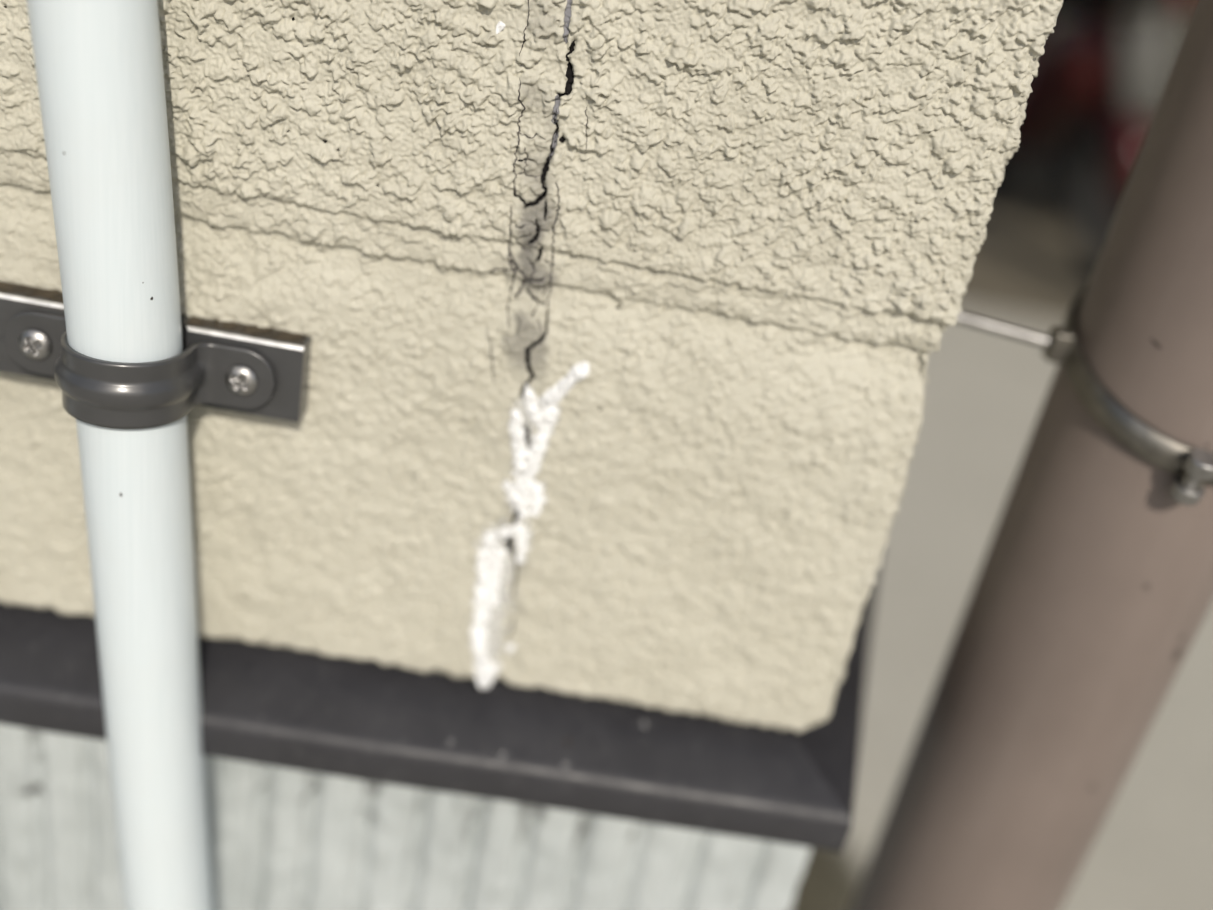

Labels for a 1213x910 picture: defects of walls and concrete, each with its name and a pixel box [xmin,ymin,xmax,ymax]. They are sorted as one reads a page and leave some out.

crack [486,0,588,449]
crack [504,508,518,636]
efflorescence [466,362,590,689]